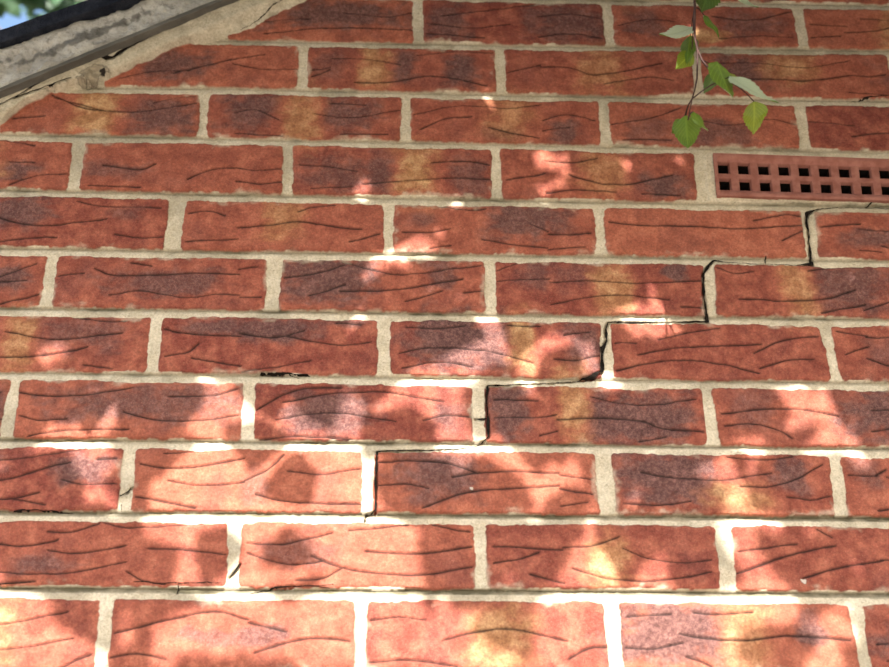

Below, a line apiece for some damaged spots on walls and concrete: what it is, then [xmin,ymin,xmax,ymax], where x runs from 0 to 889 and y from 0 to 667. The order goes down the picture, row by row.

crack [364,208,830,522]